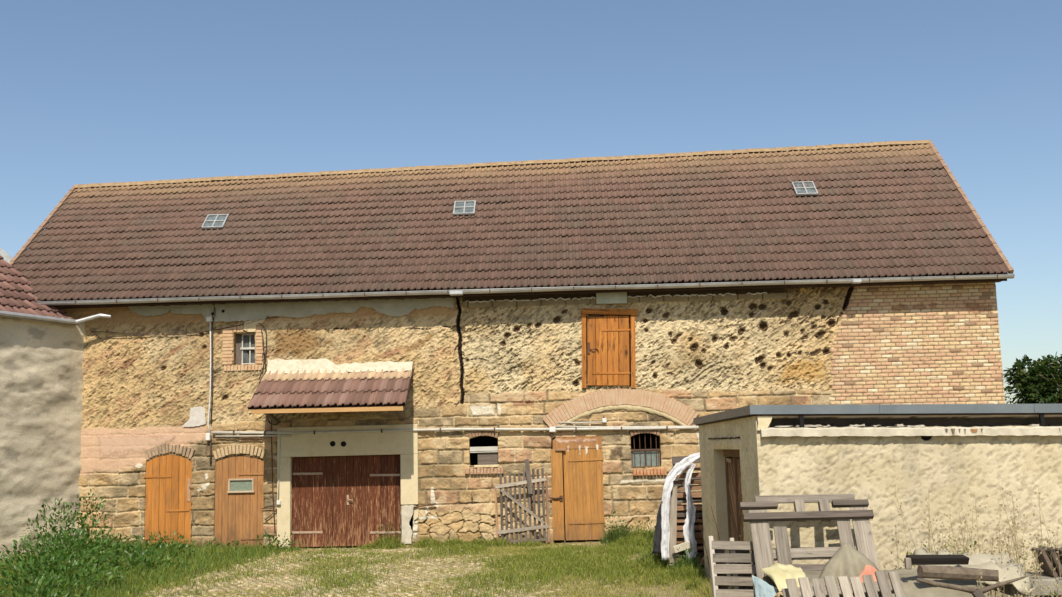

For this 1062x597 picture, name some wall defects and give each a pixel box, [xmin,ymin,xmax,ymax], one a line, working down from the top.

crack [406,298,489,406]
spalling [628,292,769,368]
spalling [756,300,837,371]
crack [837,287,853,323]